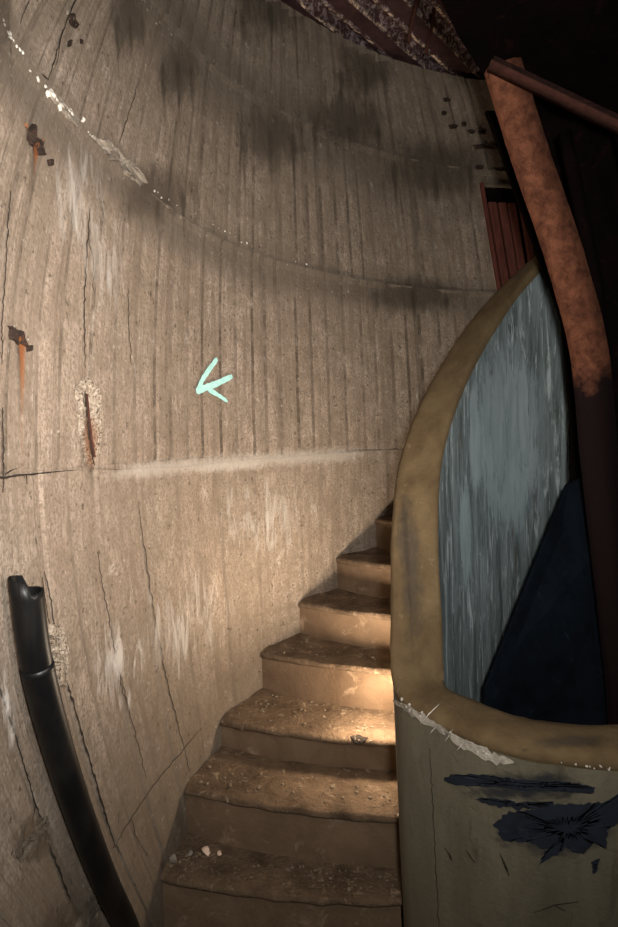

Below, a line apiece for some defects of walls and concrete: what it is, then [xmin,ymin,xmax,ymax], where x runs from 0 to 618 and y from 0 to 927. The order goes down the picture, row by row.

crack [67,510,202,856]
spalling [393,697,514,766]